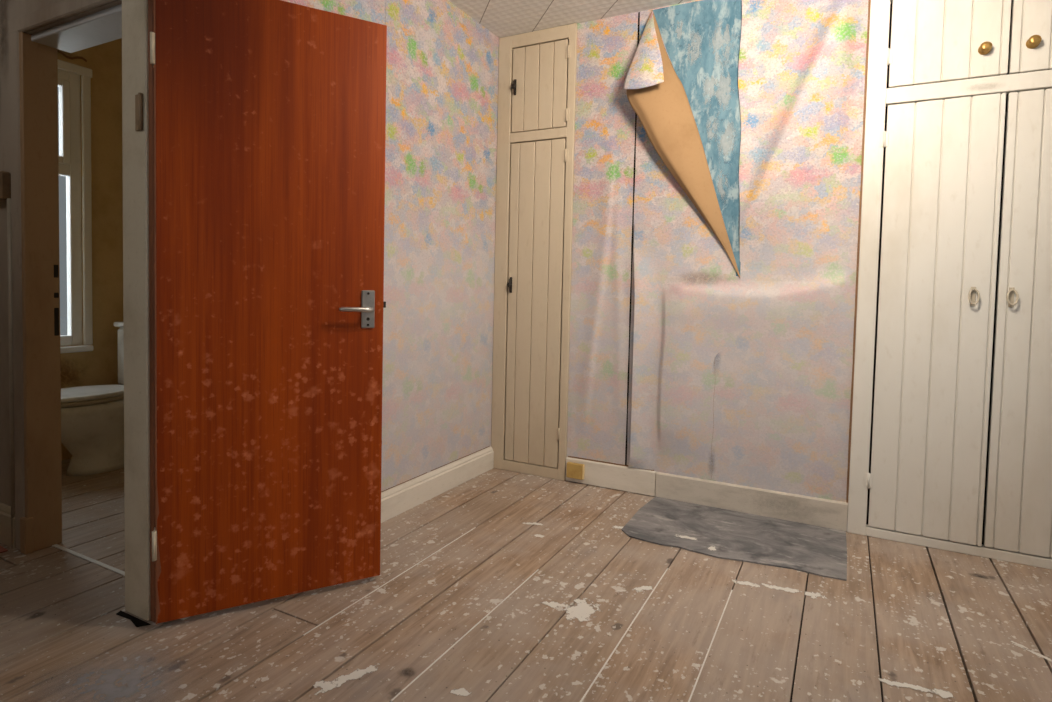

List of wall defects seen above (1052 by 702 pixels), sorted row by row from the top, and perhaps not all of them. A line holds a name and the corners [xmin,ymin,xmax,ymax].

flaking render [653,0,742,276]